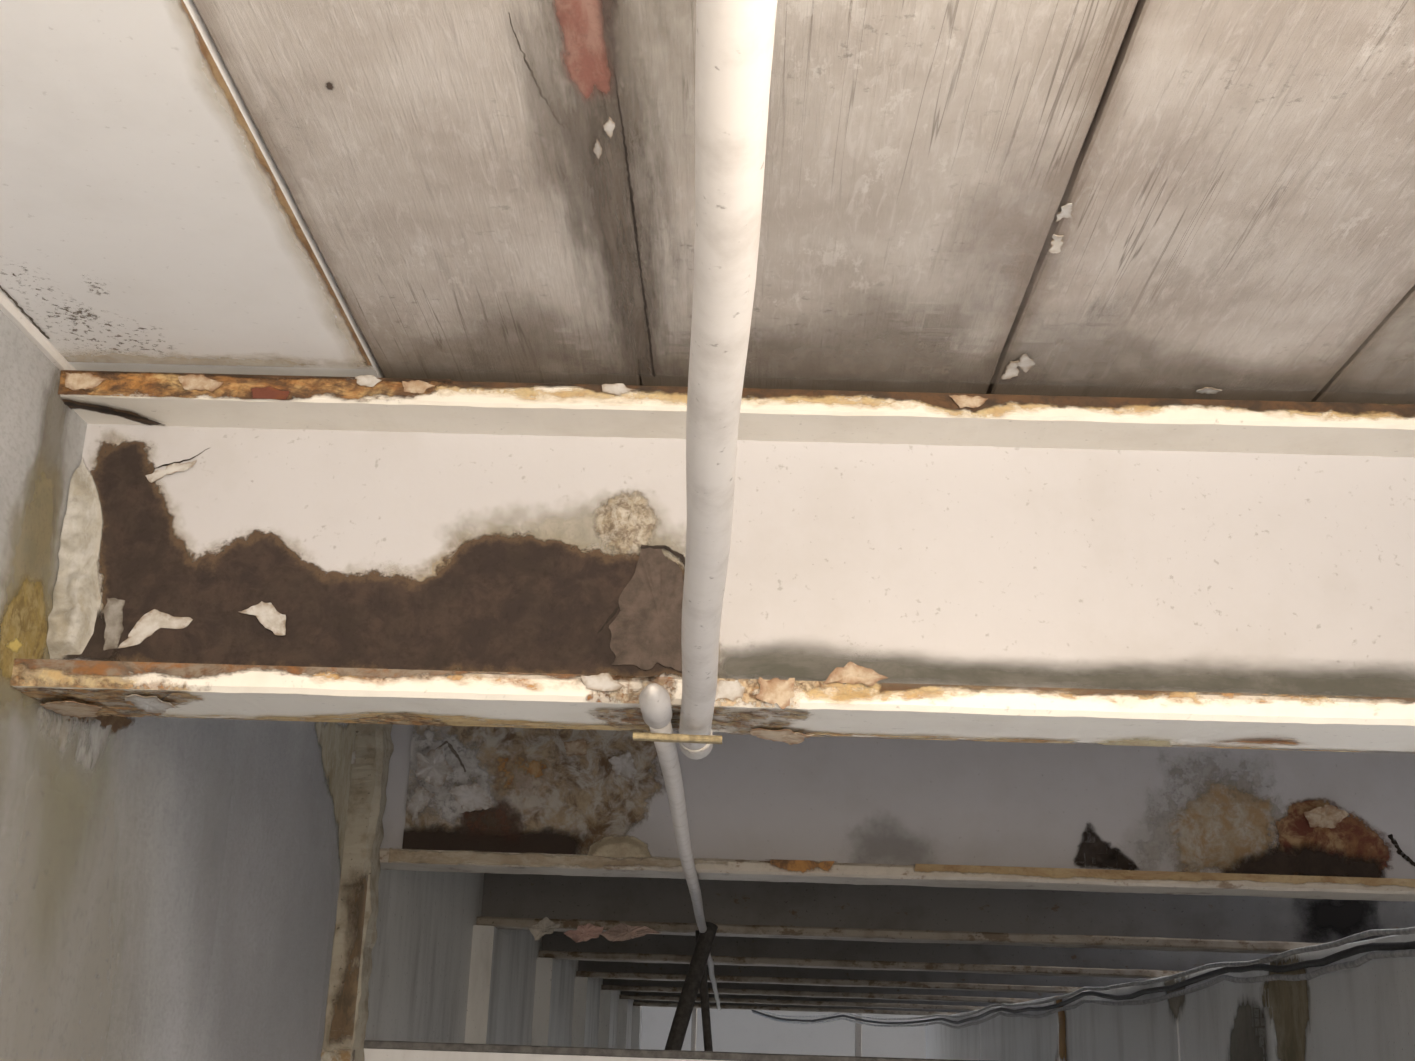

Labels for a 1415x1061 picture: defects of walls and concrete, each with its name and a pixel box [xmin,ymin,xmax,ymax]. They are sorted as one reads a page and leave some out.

corrosion [58,0,688,426]
water stain [508,0,660,377]
mould [0,269,161,356]
corrosion [742,388,1415,419]
peeling [90,441,685,678]
peeling [824,661,888,686]
spalling [402,725,663,855]
spalling [1138,757,1415,878]
peeling [321,874,368,1061]